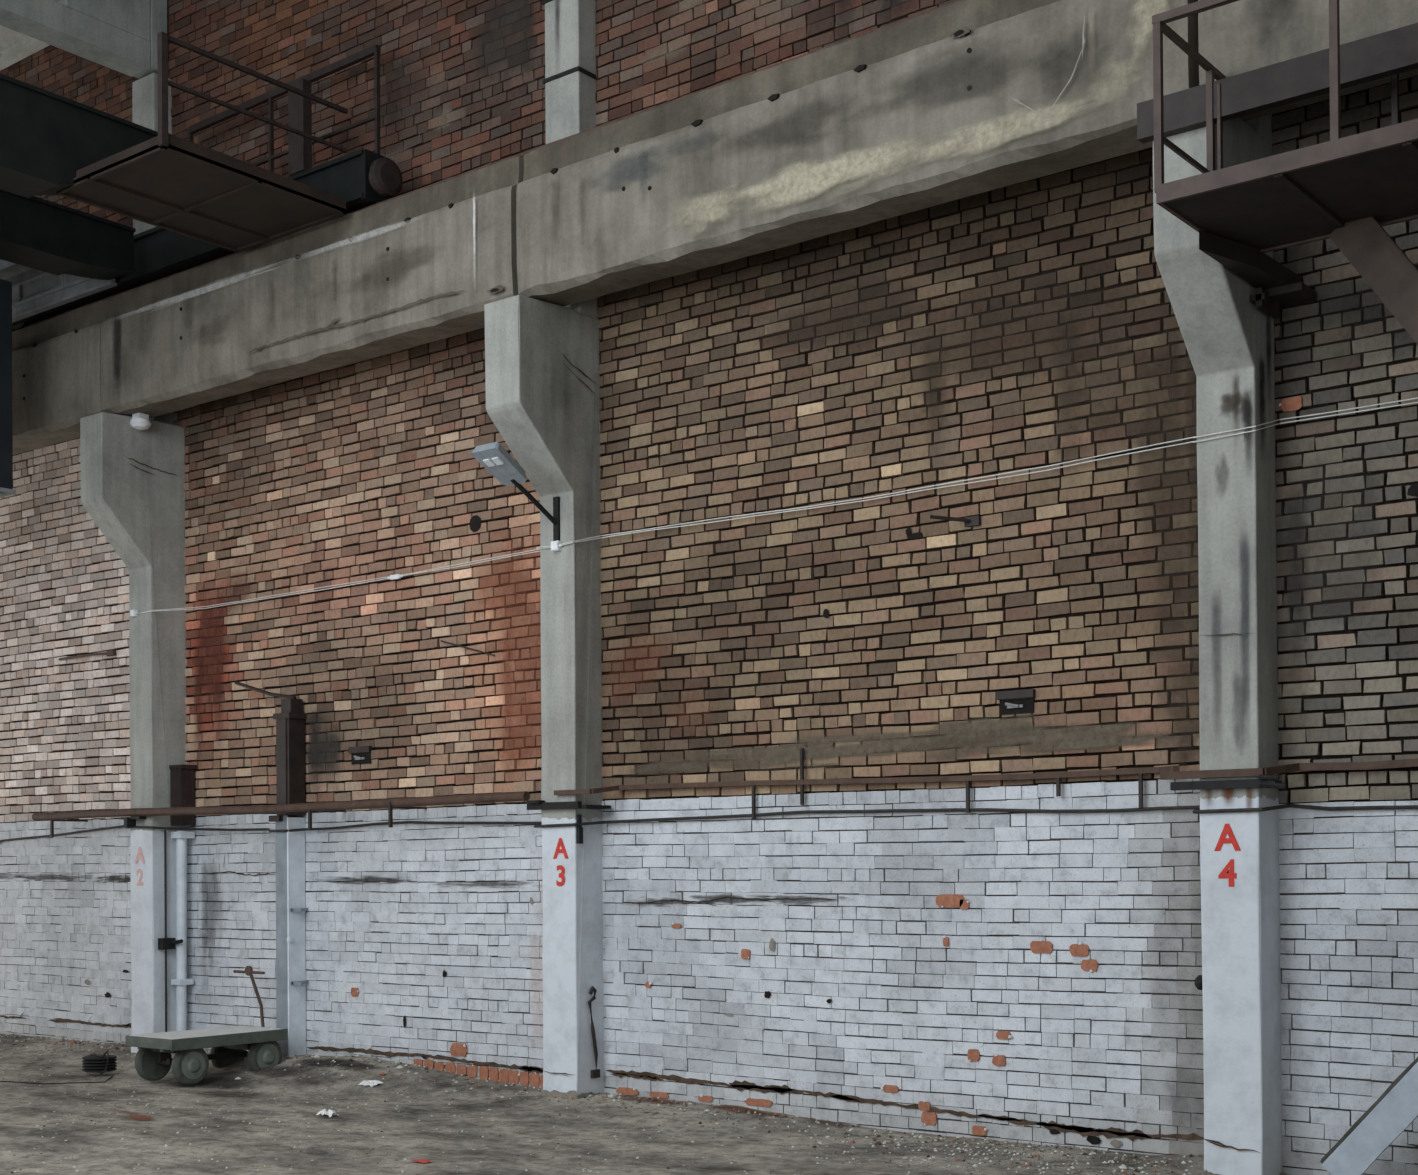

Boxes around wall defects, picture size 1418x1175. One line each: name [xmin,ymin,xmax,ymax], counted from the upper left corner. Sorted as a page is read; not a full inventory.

damp [1222,382,1251,446]
damp [1235,540,1247,687]
crack [633,897,836,906]
peeling [936,894,970,909]
peeling [1030,940,1098,972]
peeling [967,1031,1012,1066]
peeling [413,1043,669,1099]
peeling [744,1098,773,1107]
crack [307,1046,1260,1153]
peeling [880,1085,899,1093]
peeling [918,1100,937,1125]
peeling [1087,1135,1122,1148]